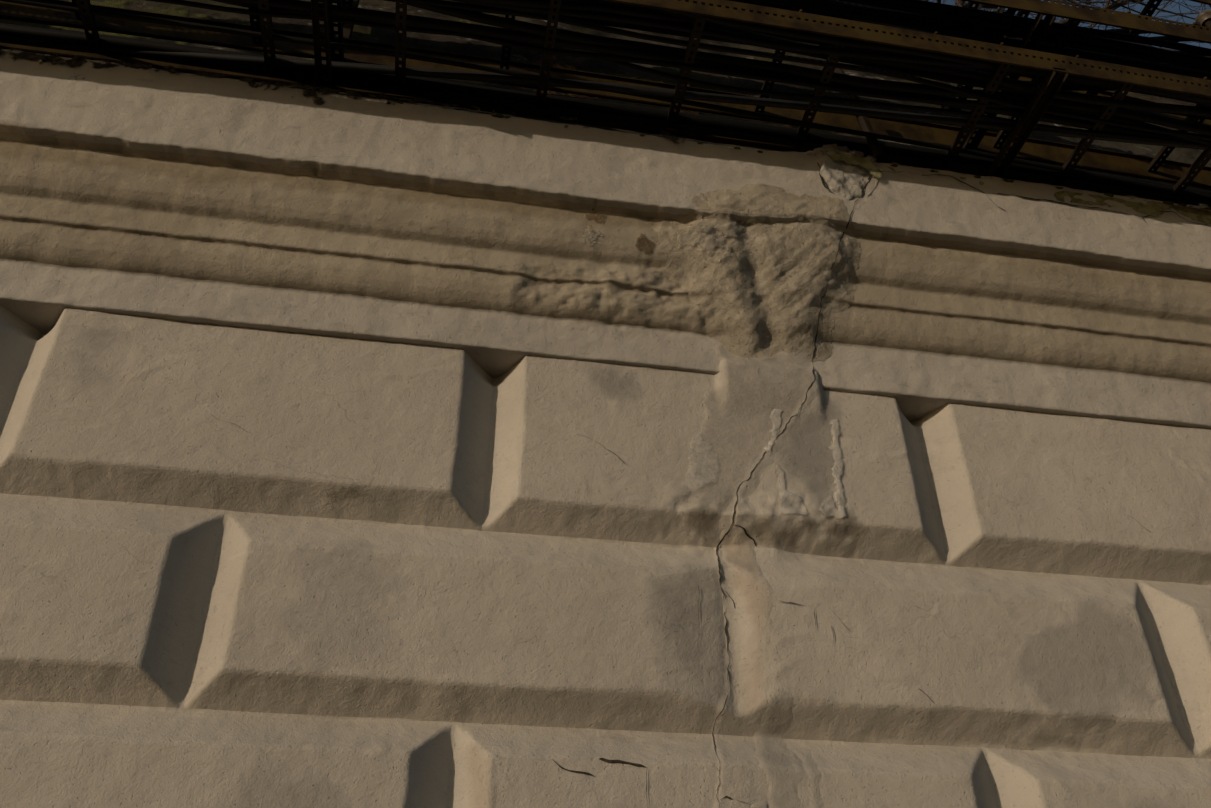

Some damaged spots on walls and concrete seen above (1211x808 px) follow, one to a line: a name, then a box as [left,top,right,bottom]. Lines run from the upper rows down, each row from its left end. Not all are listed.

peeling [806,144,876,200]
crack [697,171,1211,808]